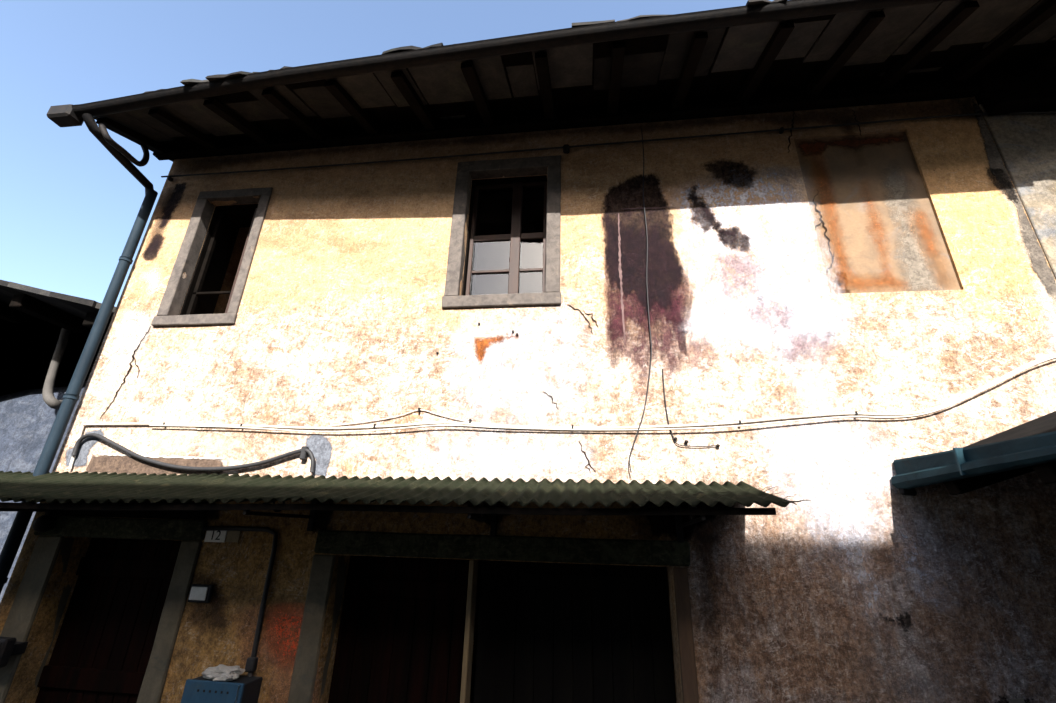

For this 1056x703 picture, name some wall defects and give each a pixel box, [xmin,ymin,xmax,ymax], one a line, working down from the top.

corrosion [797,134,906,156]
water stain [143,183,186,260]
water stain [602,173,838,369]
crack [100,326,151,418]